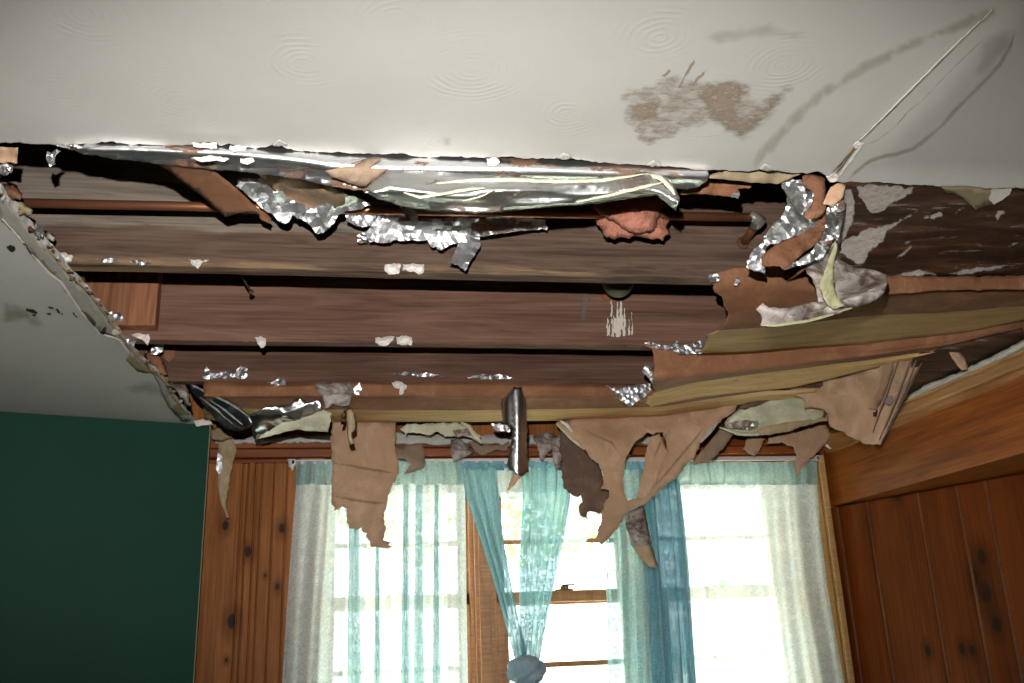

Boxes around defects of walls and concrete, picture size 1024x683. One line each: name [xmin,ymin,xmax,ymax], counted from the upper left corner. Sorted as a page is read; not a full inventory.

leakage [632,62,777,140]
flaking render [193,142,255,165]
peeling [18,210,120,335]
peeling [125,351,190,416]